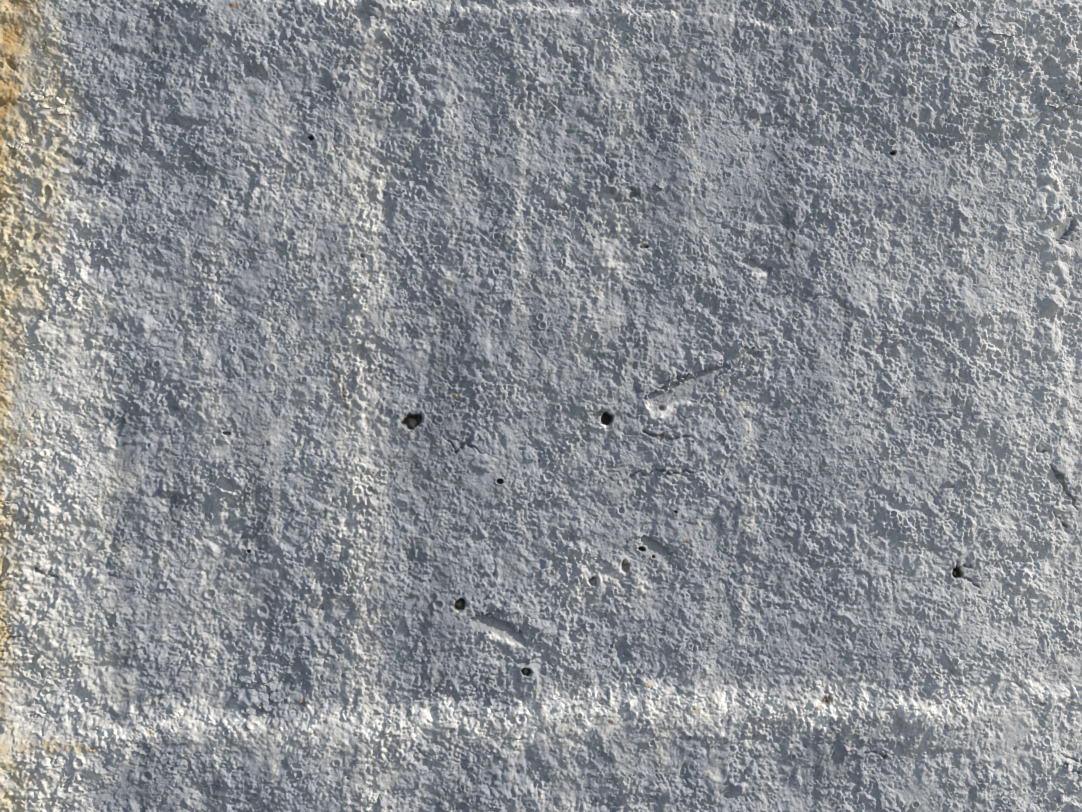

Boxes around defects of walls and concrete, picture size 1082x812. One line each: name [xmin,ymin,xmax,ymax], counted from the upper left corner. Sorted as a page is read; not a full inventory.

corrosion [0,0,49,310]
corrosion [39,180,55,202]